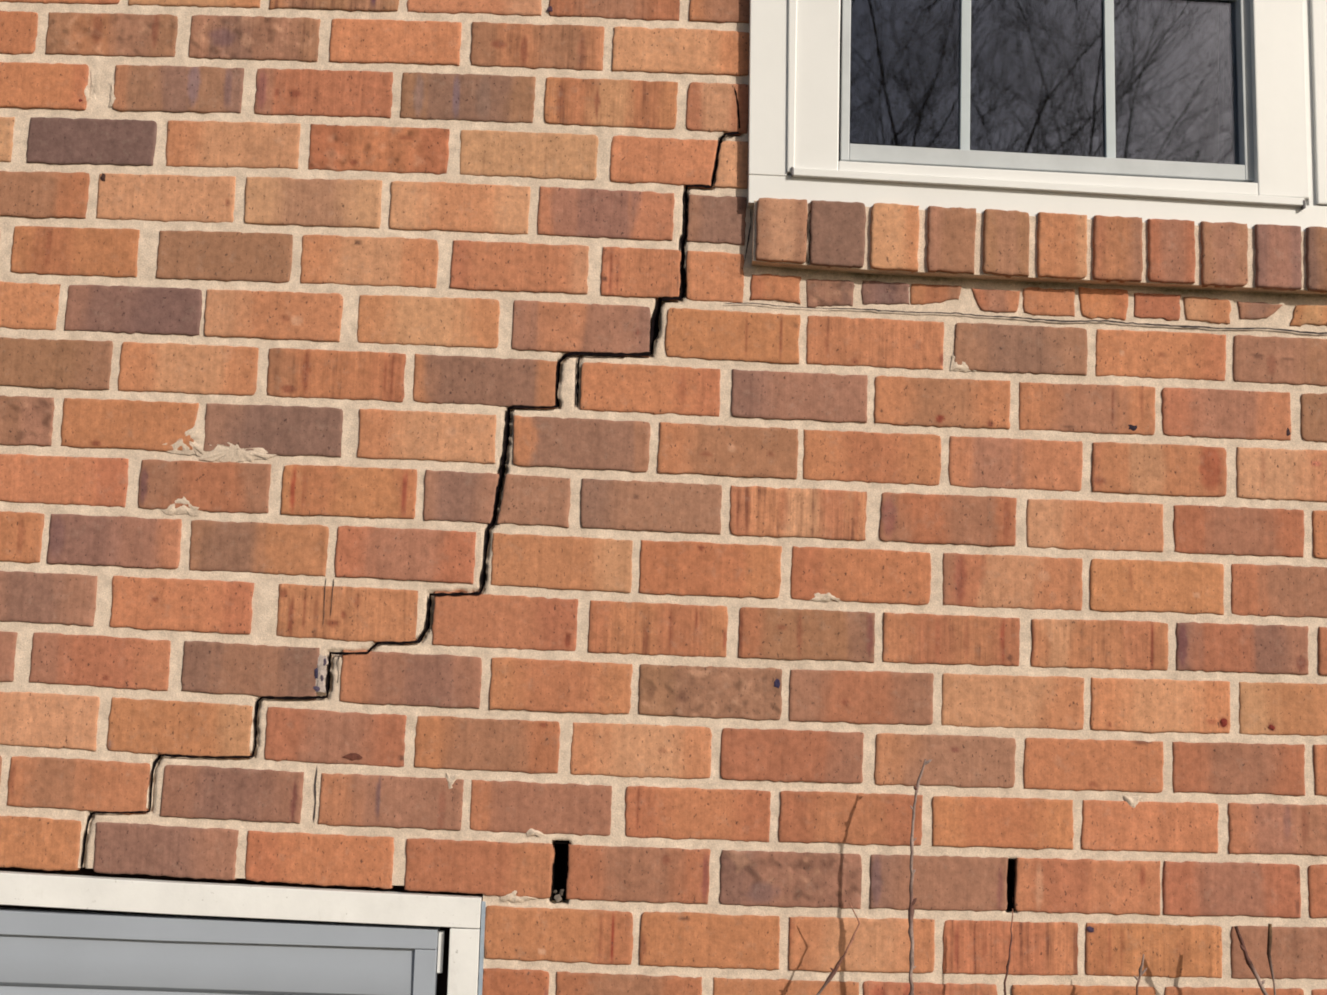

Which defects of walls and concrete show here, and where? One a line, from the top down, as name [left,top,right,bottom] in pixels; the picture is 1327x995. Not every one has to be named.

crack [81,88,741,872]